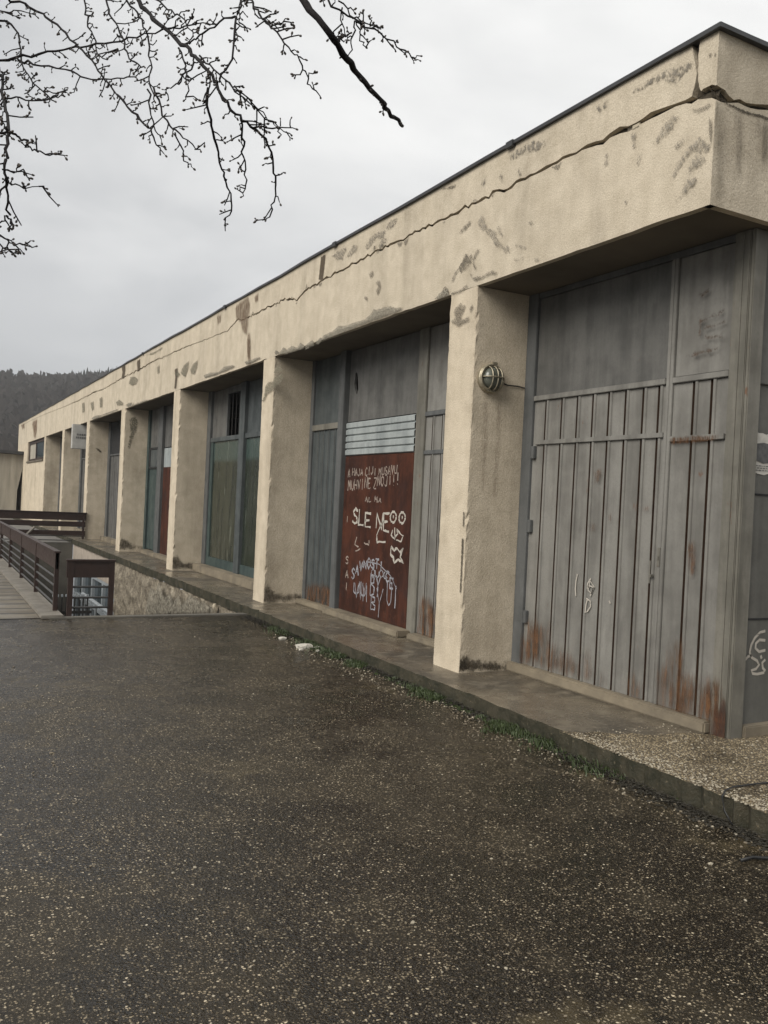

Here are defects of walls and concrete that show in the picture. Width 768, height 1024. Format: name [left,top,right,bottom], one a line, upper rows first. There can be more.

peeling [633,63,692,93]
crack [591,85,768,147]
peeling [673,92,727,198]
peeling [333,219,397,260]
peeling [460,217,538,261]
peeling [436,250,497,326]
spalling [262,271,401,401]
corrosion [663,647,726,738]